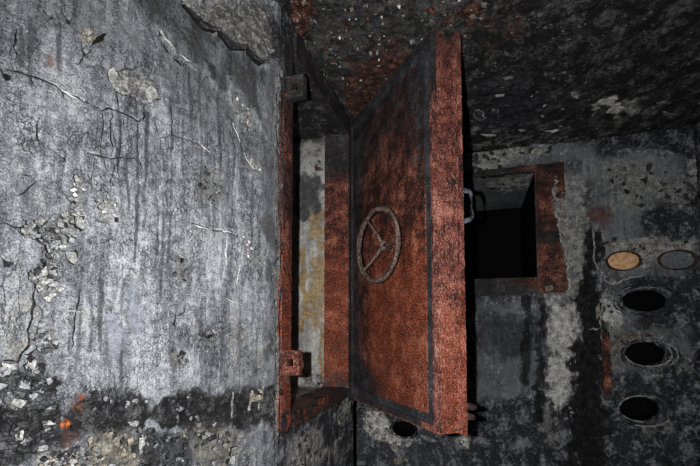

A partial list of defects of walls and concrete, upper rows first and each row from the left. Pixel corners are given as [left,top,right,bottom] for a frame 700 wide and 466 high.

spalling [71,27,106,65]
crack [3,29,211,182]
spalling [107,66,161,106]
spalling [182,2,275,66]
rust [345,41,410,117]
rust [442,1,493,27]
peeling [20,174,87,303]
crack [3,285,36,370]
damp [296,175,325,382]
damp [600,296,622,329]
peeling [0,321,243,466]
damp [248,385,265,411]